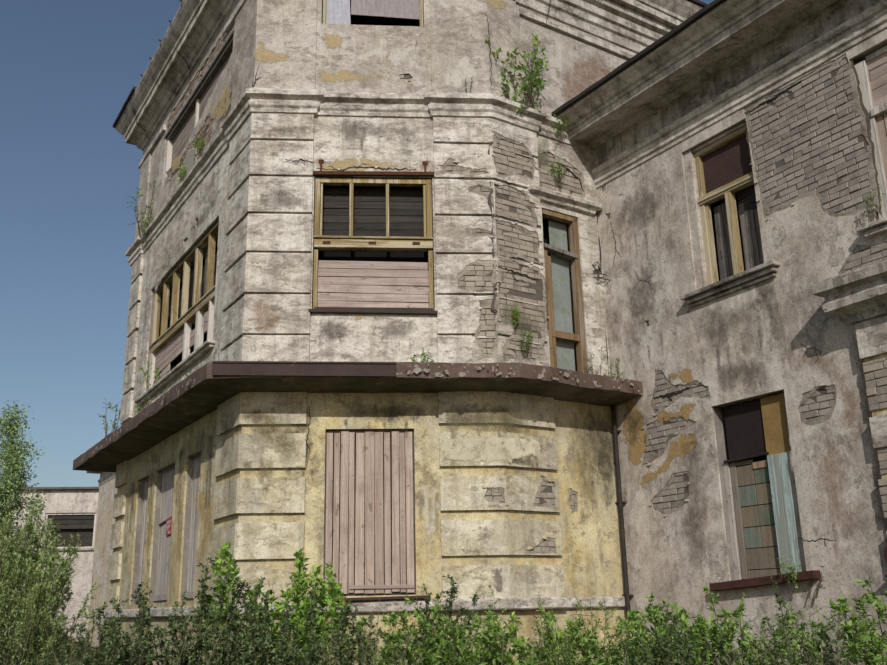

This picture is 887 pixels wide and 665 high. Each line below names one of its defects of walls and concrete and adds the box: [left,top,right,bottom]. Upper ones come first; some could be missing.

spalling [166,27,233,131]
peeling [314,33,383,83]
peeling [357,42,421,85]
spalling [166,83,232,181]
peeling [322,153,418,171]
spalling [744,53,881,220]
spalling [405,132,586,377]
leakage [360,406,419,419]
spalling [613,318,710,517]
spalling [482,485,508,506]
spalling [533,475,556,513]
spalling [789,382,836,556]